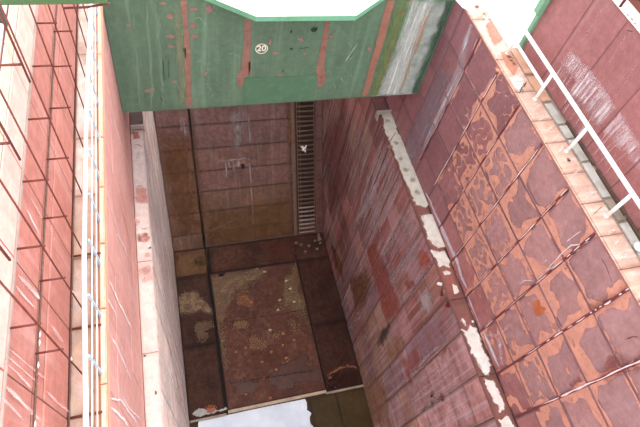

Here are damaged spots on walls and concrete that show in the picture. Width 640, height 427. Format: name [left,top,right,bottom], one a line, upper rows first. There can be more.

corrosion [400,7,433,90]
peeling [501,51,518,75]
water stain [557,54,610,133]
water stain [603,119,637,153]
peeling [367,246,399,317]
peeling [382,65,640,427]
corrosion [532,300,546,316]